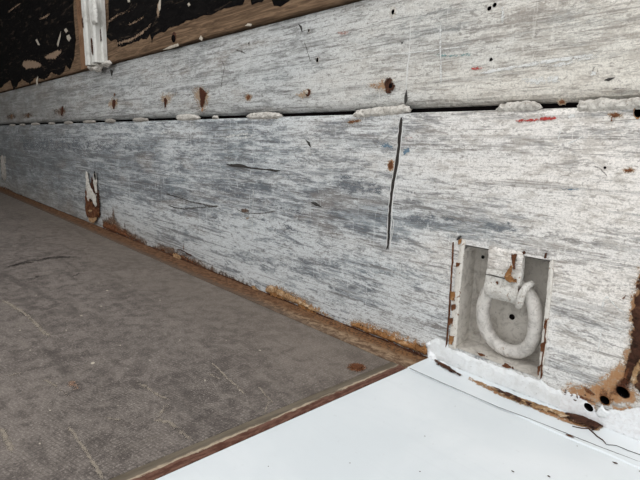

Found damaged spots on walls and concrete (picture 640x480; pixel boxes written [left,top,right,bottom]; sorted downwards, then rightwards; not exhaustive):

peeling [0,0,84,90]
peeling [91,0,264,55]
rust [193,87,208,111]
rust [371,78,395,94]
crack [386,22,411,250]
rust [445,242,454,347]
rust [562,267,640,411]
rust [469,377,603,431]